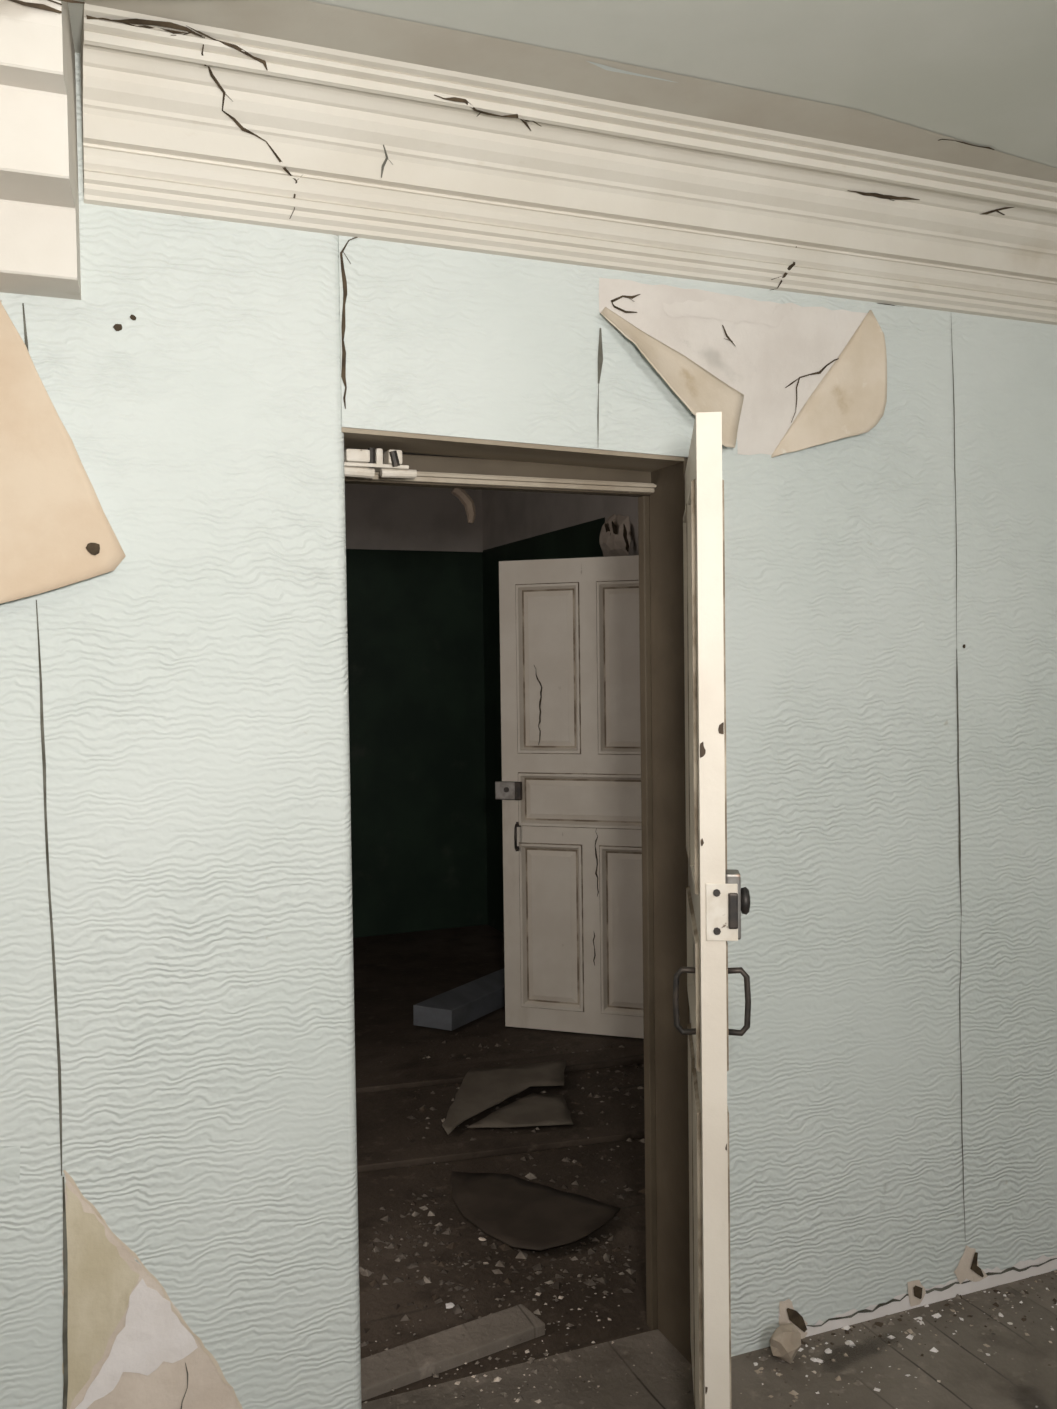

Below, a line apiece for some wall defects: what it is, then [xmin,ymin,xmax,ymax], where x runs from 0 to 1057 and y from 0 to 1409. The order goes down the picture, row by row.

crack [10,0,297,218]
crack [434,95,541,131]
crack [848,190,920,201]
crack [982,207,1014,215]
peeling [0,300,126,604]
flaking render [599,278,887,458]
flaking render [62,1170,243,1409]
flaking render [778,1245,1057,1339]